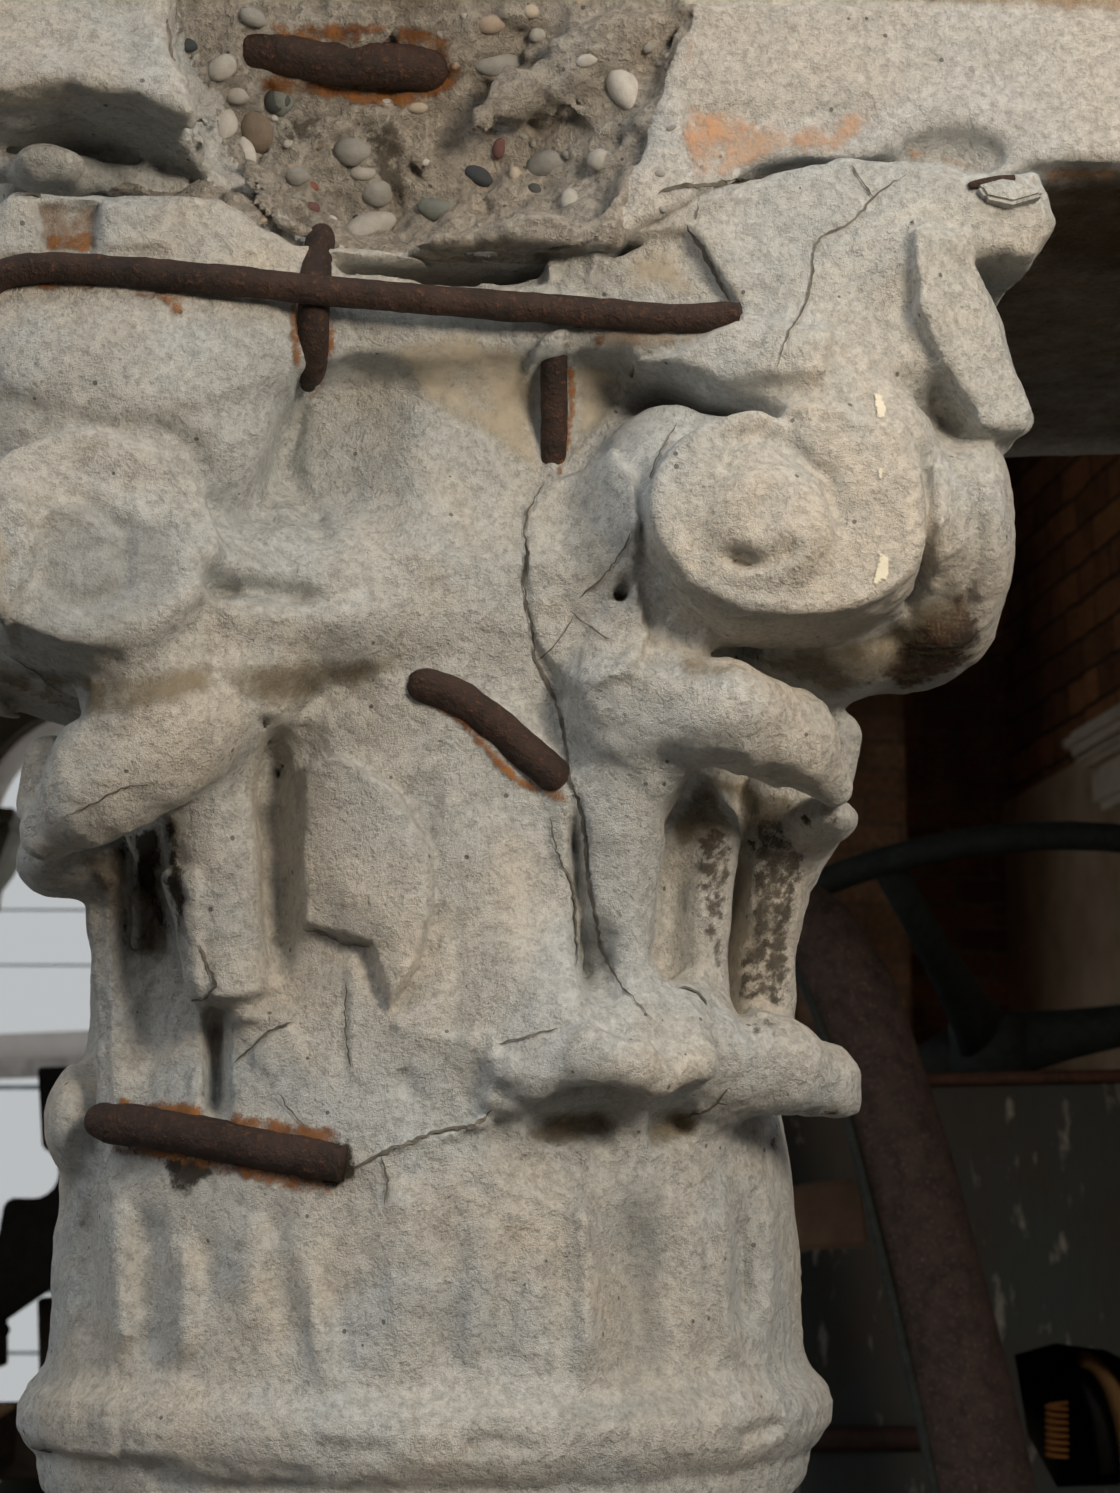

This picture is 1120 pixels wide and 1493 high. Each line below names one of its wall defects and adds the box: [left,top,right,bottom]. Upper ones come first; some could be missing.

corrosion [263,23,461,107]
spalling [0,0,743,392]
crack [777,165,905,366]
crack [649,423,677,477]
corrosion [439,709,565,800]
crack [522,482,653,1019]
crack [500,1028,557,1044]
crack [680,986,707,1004]
corrosion [120,1098,201,1115]
corrosion [115,1147,326,1190]
corrosion [231,1113,334,1141]
crack [349,1110,492,1205]